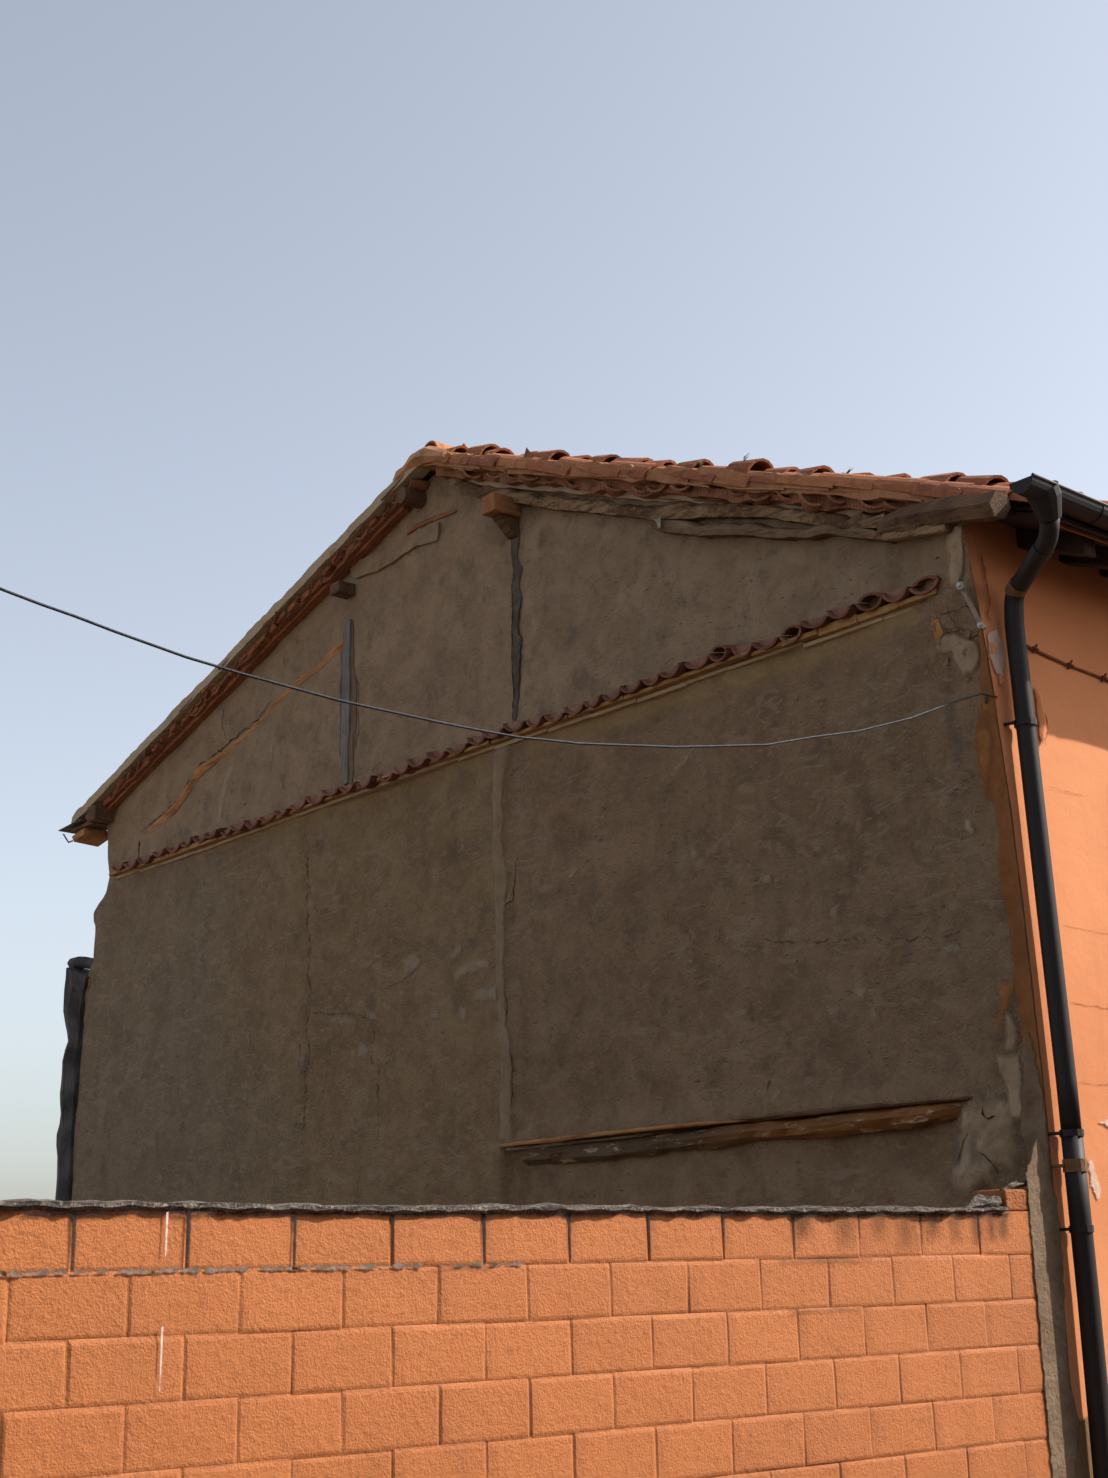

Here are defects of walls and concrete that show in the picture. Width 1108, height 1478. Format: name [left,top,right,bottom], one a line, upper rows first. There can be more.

crack [298,832,417,1144]
water stain [514,1213,1008,1257]